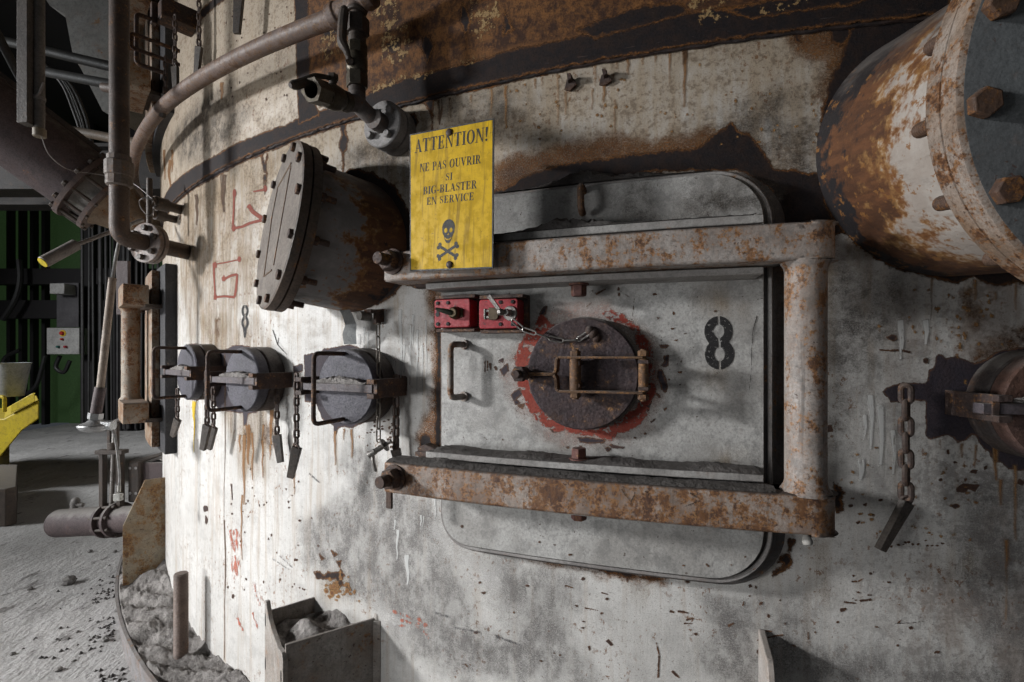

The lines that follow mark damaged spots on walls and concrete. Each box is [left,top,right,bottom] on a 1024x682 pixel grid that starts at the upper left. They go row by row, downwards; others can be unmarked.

corrosion [309,34,348,91]
peeling [370,0,435,93]
peeling [459,0,501,39]
corrosion [366,0,766,94]
peeling [576,0,865,40]
corrosion [787,30,843,116]
corrosion [490,50,723,189]
corrosion [877,324,911,353]
corrosion [238,410,274,554]
corrosion [931,444,1024,569]
corrosion [324,571,360,602]